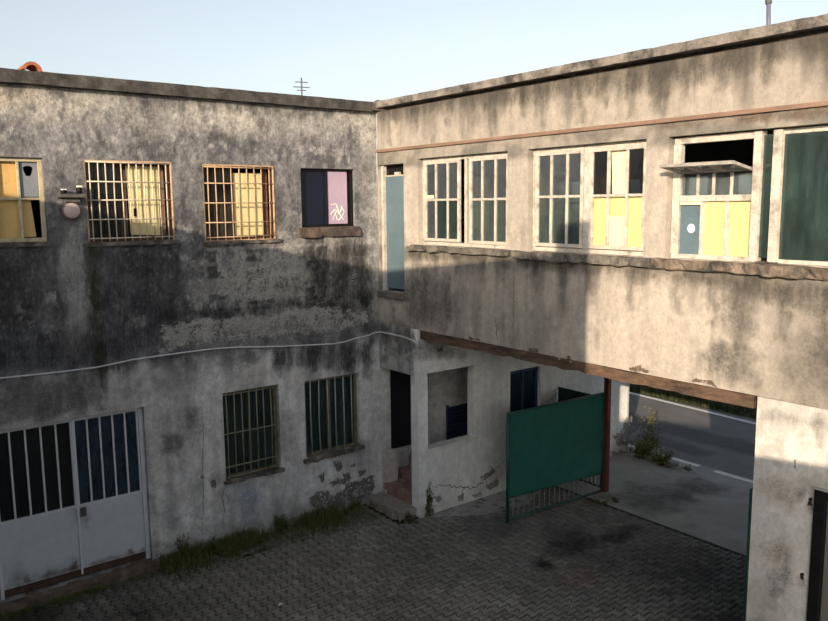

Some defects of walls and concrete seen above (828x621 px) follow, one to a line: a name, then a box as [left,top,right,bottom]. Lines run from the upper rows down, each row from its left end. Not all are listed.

damp [60,222,121,386]
peeling [218,242,301,305]
peeling [159,269,369,357]
flaking render [309,442,375,512]
crack [432,459,506,500]